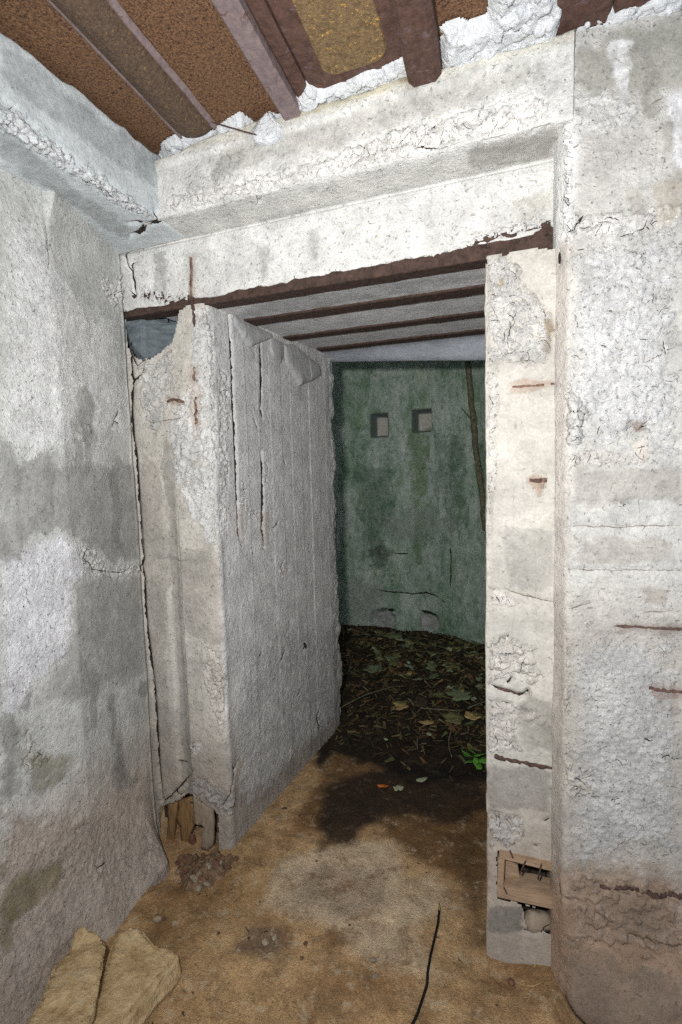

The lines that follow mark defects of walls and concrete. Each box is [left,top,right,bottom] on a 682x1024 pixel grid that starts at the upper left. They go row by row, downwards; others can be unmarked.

spalling [0,104,154,219]
rust [167,397,198,424]
crack [208,328,285,547]
crack [83,213,193,800]
water stain [0,447,180,699]
spalling [183,775,235,816]
rust [494,754,552,770]
rust [600,884,682,900]